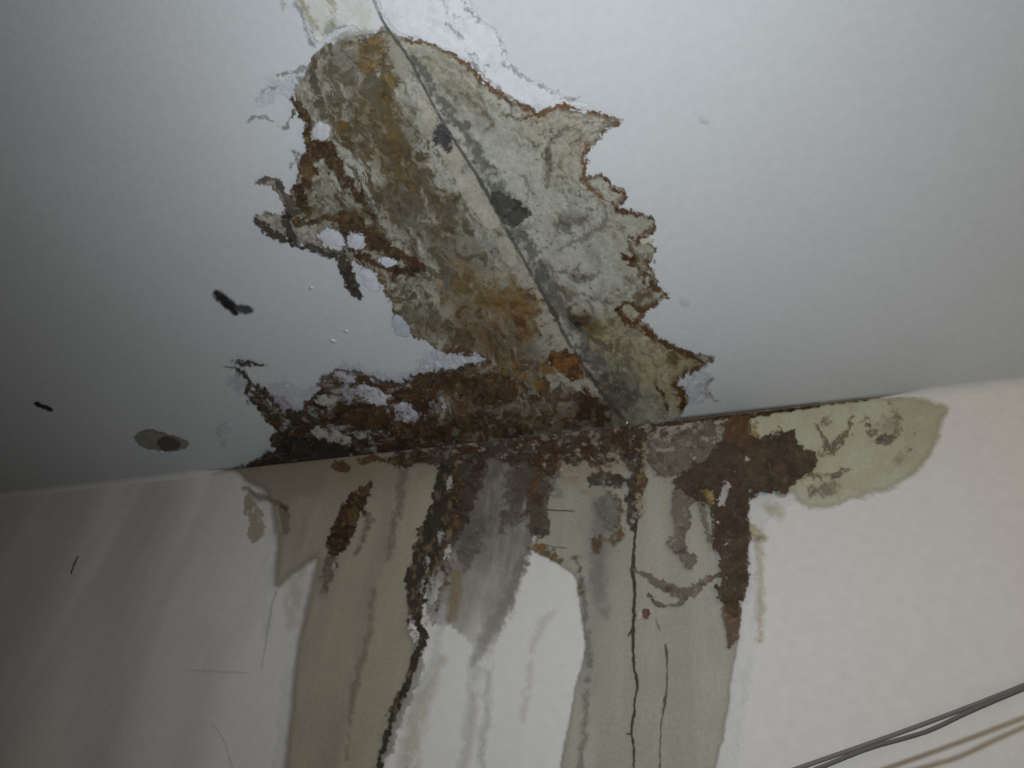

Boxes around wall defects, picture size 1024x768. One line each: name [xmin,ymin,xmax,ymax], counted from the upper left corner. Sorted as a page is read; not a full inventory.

flaking render [253,13,713,449]
leakage [135,429,189,452]
rust [319,481,372,590]
rust [224,359,484,469]
leakage [237,397,948,768]
crack [626,456,668,768]